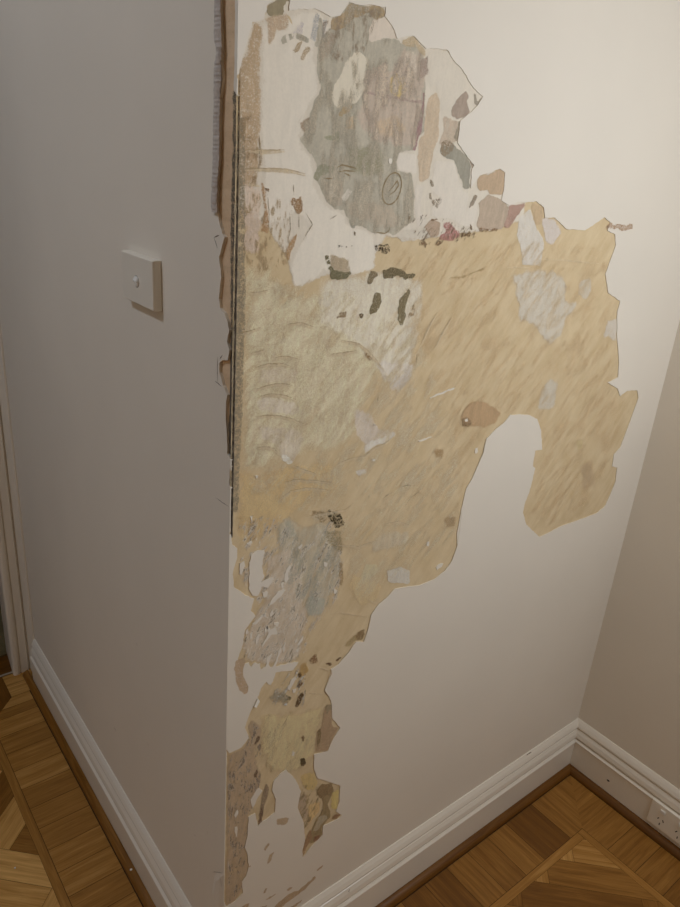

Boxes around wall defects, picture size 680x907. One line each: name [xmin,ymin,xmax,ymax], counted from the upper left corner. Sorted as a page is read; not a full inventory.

peeling [211,0,639,907]